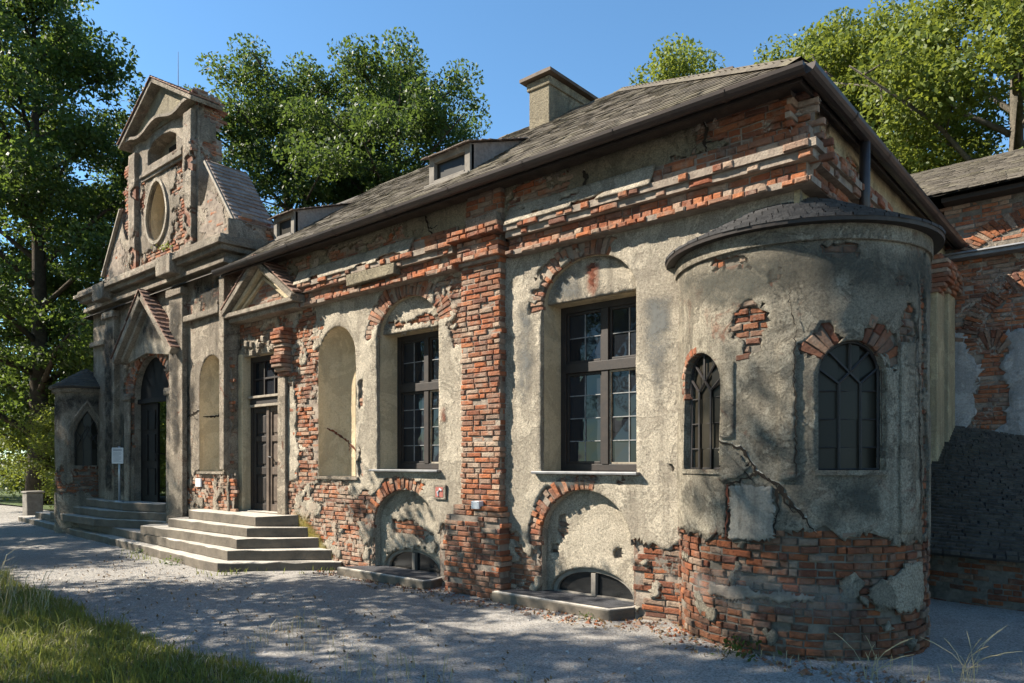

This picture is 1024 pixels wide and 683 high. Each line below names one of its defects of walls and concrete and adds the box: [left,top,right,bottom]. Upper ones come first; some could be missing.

flaking render [671,90,835,170]
flaking render [105,87,274,280]
flaking render [505,168,573,210]
flaking render [281,226,416,279]
flaking render [528,236,617,315]
flaking render [729,300,771,361]
flaking render [949,243,1024,431]
flaking render [238,307,425,566]
crack [717,282,816,537]
flaking render [187,471,239,516]
flaking render [631,438,931,661]